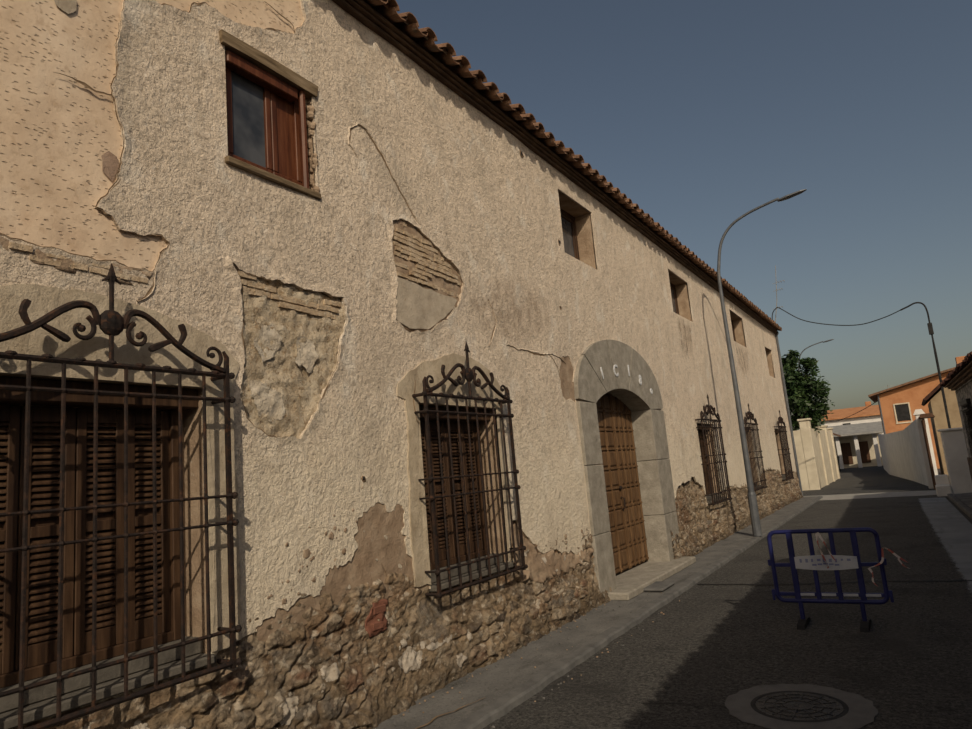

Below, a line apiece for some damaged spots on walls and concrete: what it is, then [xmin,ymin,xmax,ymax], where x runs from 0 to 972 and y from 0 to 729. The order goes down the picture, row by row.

spalling [155,0,305,34]
spalling [0,0,170,302]
crack [347,123,422,229]
spalling [392,219,462,332]
spalling [237,269,347,438]
peeling [254,502,429,642]
peeling [510,521,594,583]